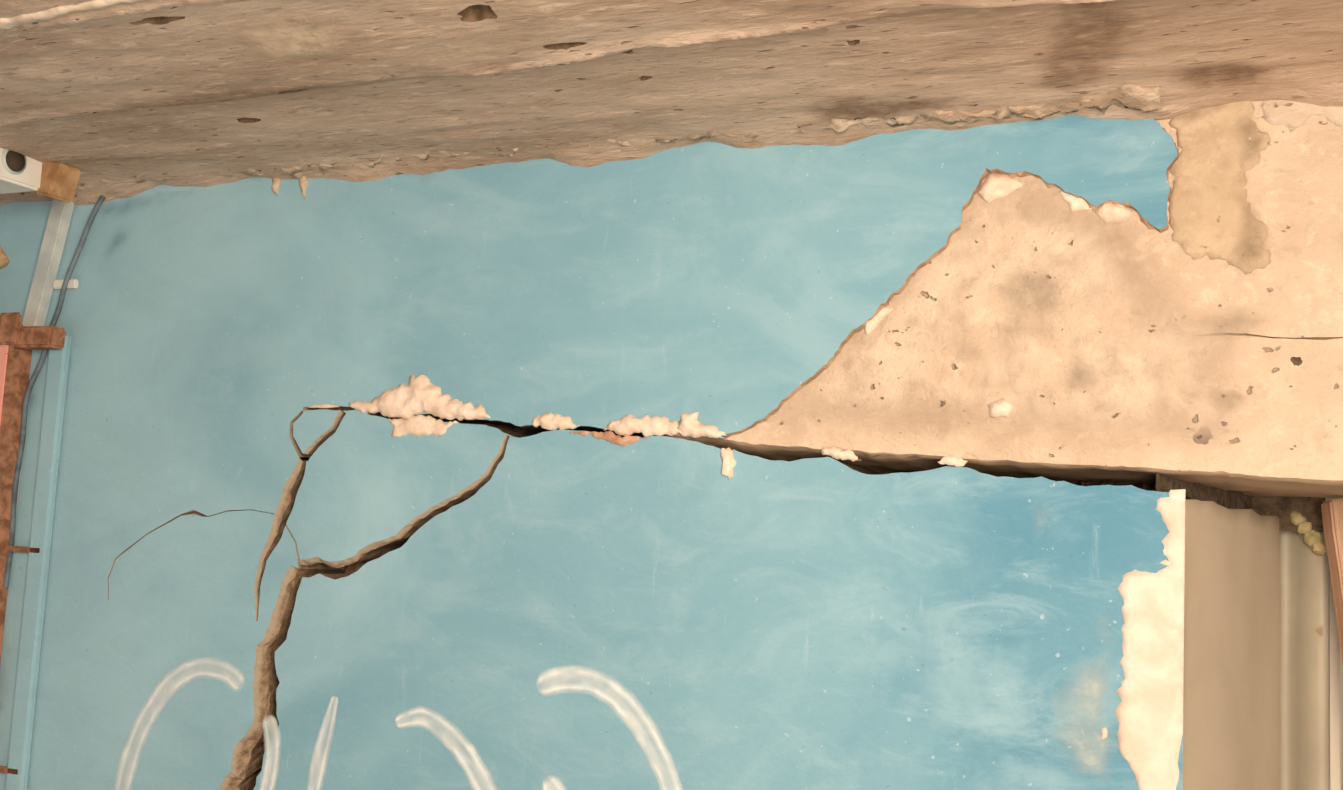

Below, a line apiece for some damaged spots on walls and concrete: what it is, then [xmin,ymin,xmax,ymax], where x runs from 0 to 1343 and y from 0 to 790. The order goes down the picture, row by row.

spalling [722,127,1224,438]
crack [1213,332,1343,340]
spalling [308,374,490,437]
crack [821,447,985,475]
crack [1028,467,1191,499]
crack [108,406,770,790]
peeling [1101,489,1186,790]